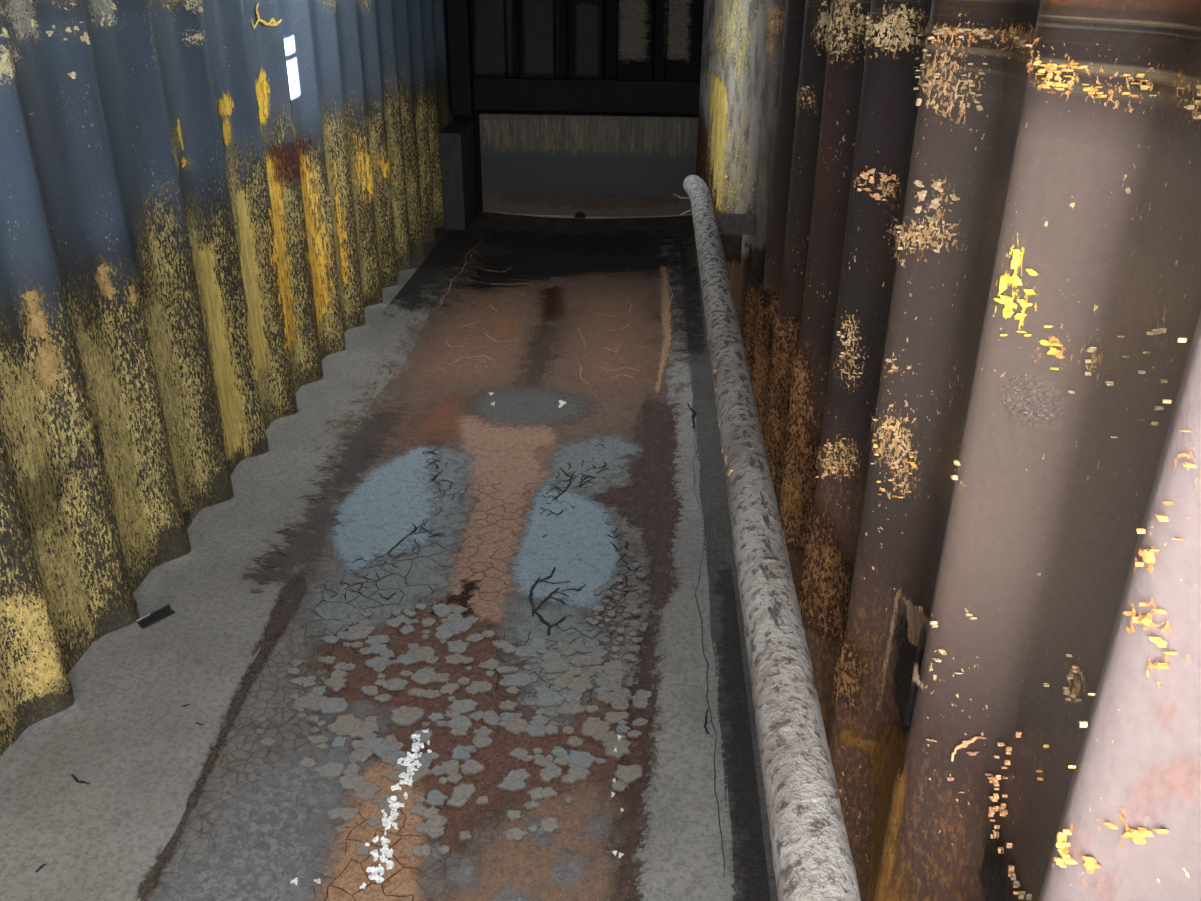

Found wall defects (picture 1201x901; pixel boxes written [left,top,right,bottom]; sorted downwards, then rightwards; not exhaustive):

corrosion [0,572,69,728]
corrosion [137,569,308,901]
corrosion [195,133,396,461]
leakage [241,403,480,648]
crack [319,806,425,901]
leakage [498,433,644,728]
corrosion [692,68,929,901]
peeling [993,233,1113,394]
peeling [1137,399,1171,425]
peeling [1143,309,1187,355]